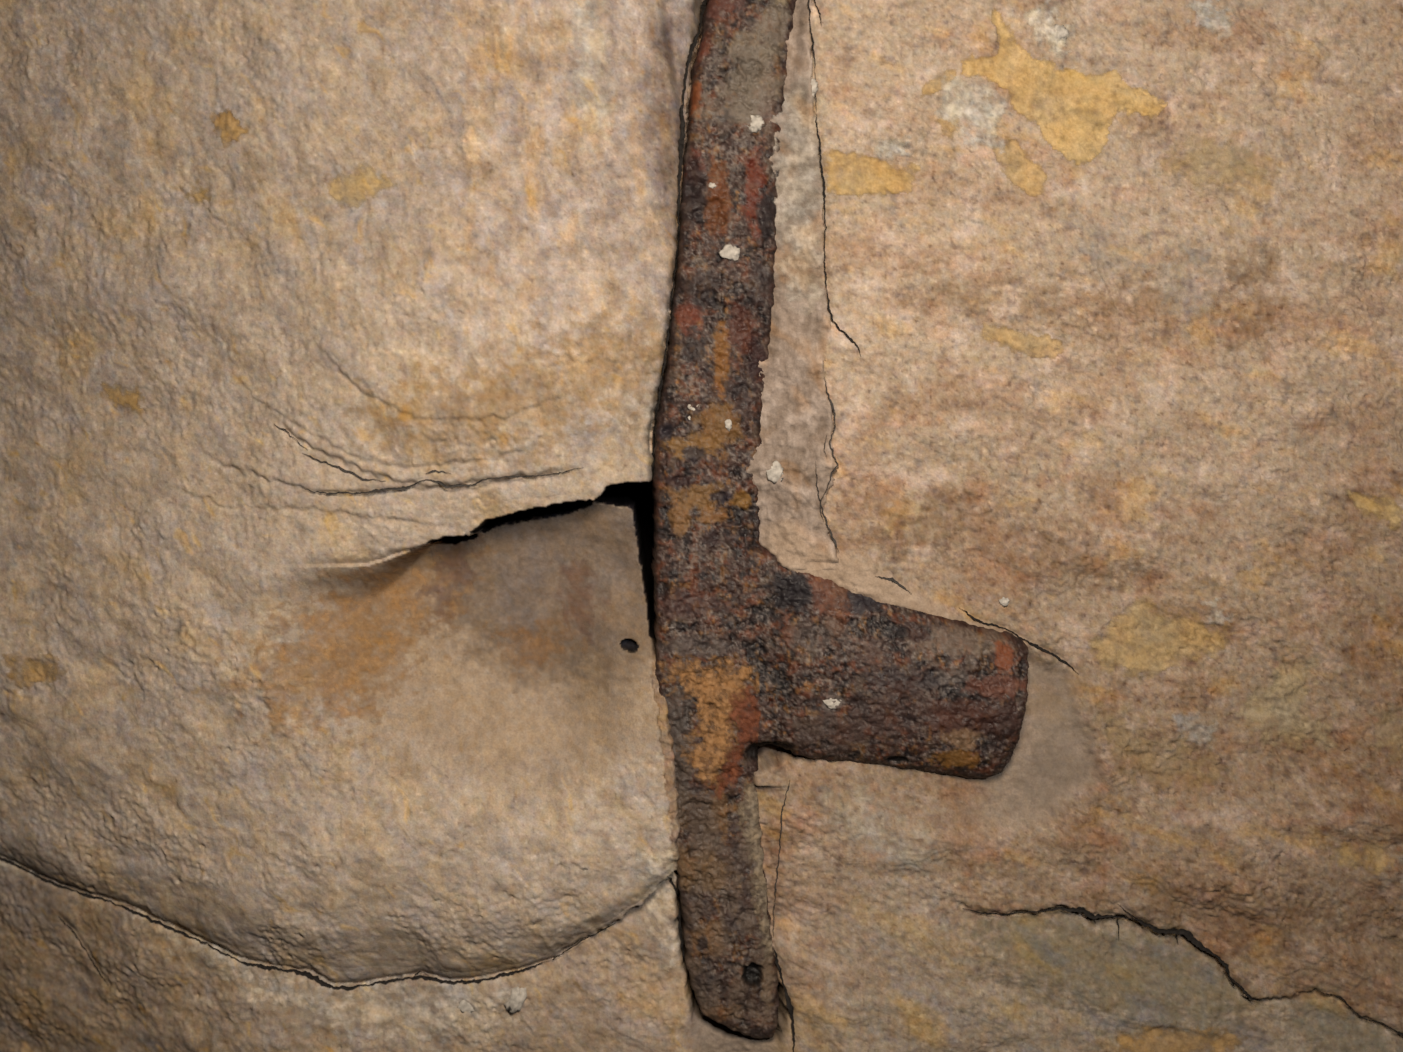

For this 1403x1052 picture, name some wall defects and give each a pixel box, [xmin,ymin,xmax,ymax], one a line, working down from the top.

crack [277,426,584,495]
rust [658,656,761,797]
crack [0,856,612,990]
crack [963,904,1259,1001]
crack [1322,992,1403,1036]